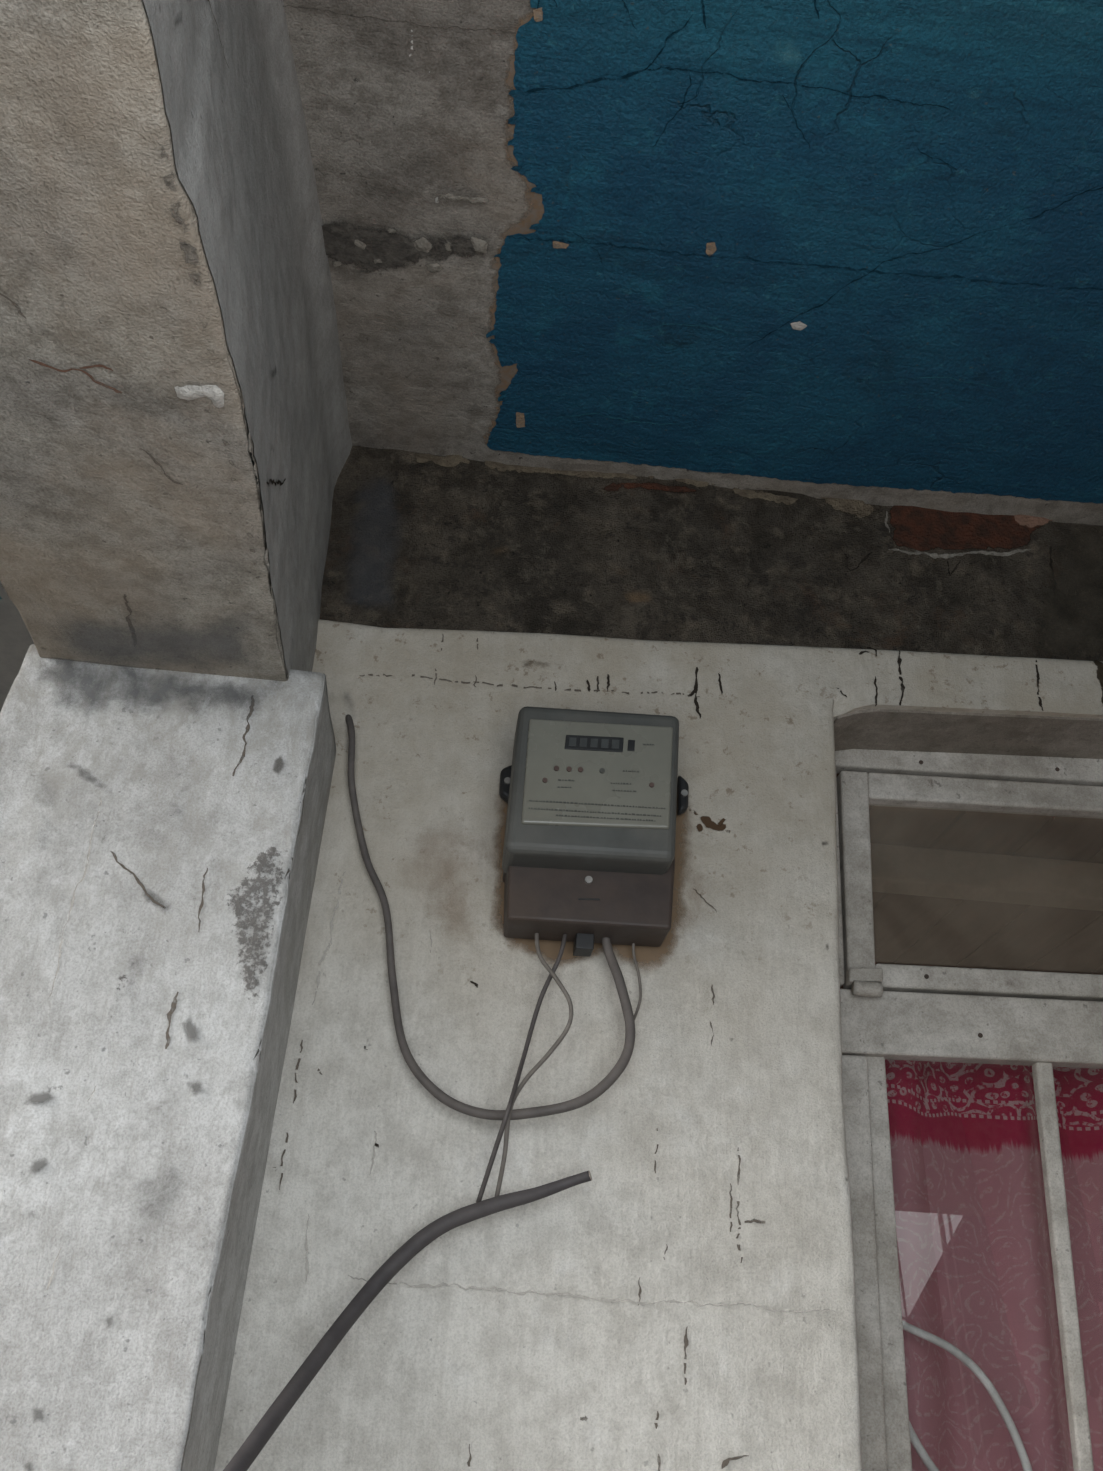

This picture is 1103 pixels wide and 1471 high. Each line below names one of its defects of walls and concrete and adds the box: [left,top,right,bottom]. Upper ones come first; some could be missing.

crack [524,0,950,148]
peeling [484,0,569,444]
peeling [706,242,716,255]
spalling [175,385,224,408]
flaking render [890,505,1041,551]
crack [232,696,255,776]
damp [1092,660,1103,703]
crack [49,798,208,997]
crack [273,1040,322,1190]
crack [729,1147,765,1263]
crack [348,1244,837,1385]
crack [722,1455,749,1469]